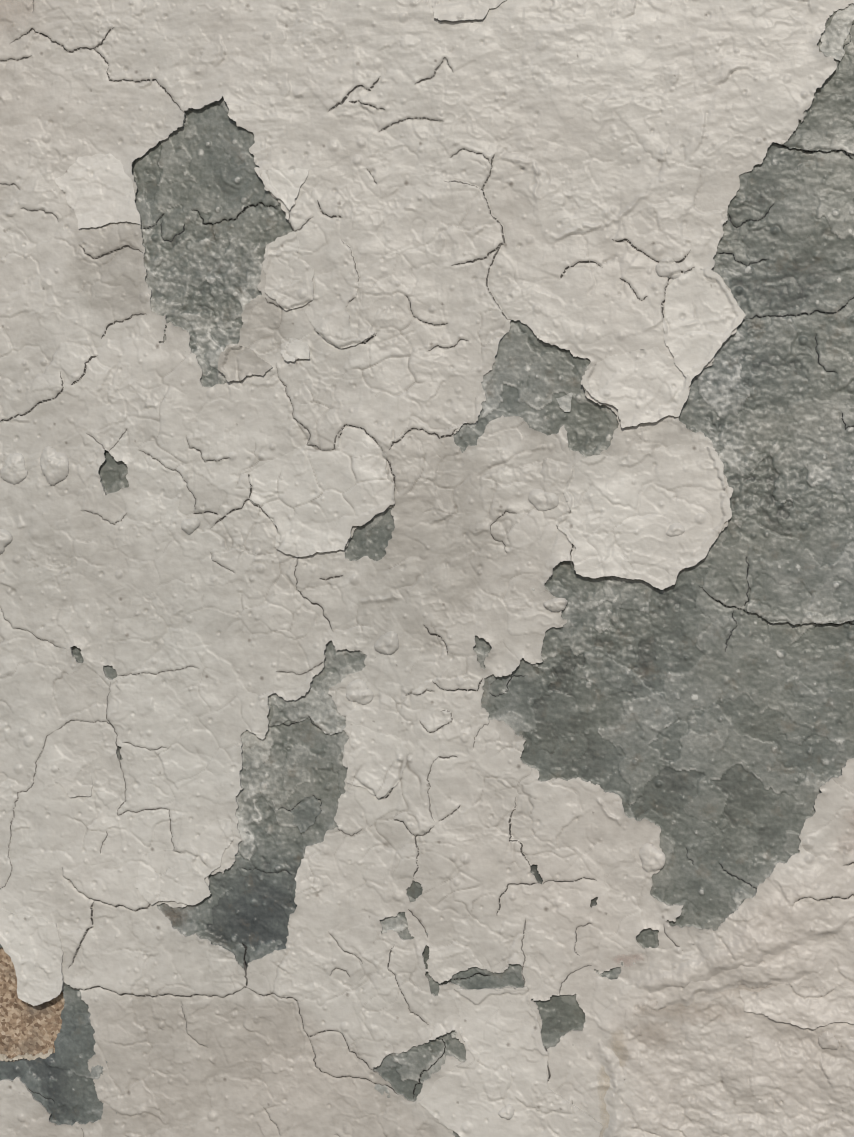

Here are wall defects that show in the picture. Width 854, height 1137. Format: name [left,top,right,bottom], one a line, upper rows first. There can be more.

crack [0,0,181,110]
crack [328,78,438,132]
crack [1,313,144,421]
peeling [55,97,375,388]
crack [445,148,511,320]
crack [560,239,694,318]
peeling [249,427,395,561]
peeling [454,4,854,948]
peeling [135,640,409,984]
peeling [0,909,117,1125]
crack [62,868,397,1094]
peeling [374,880,603,1137]